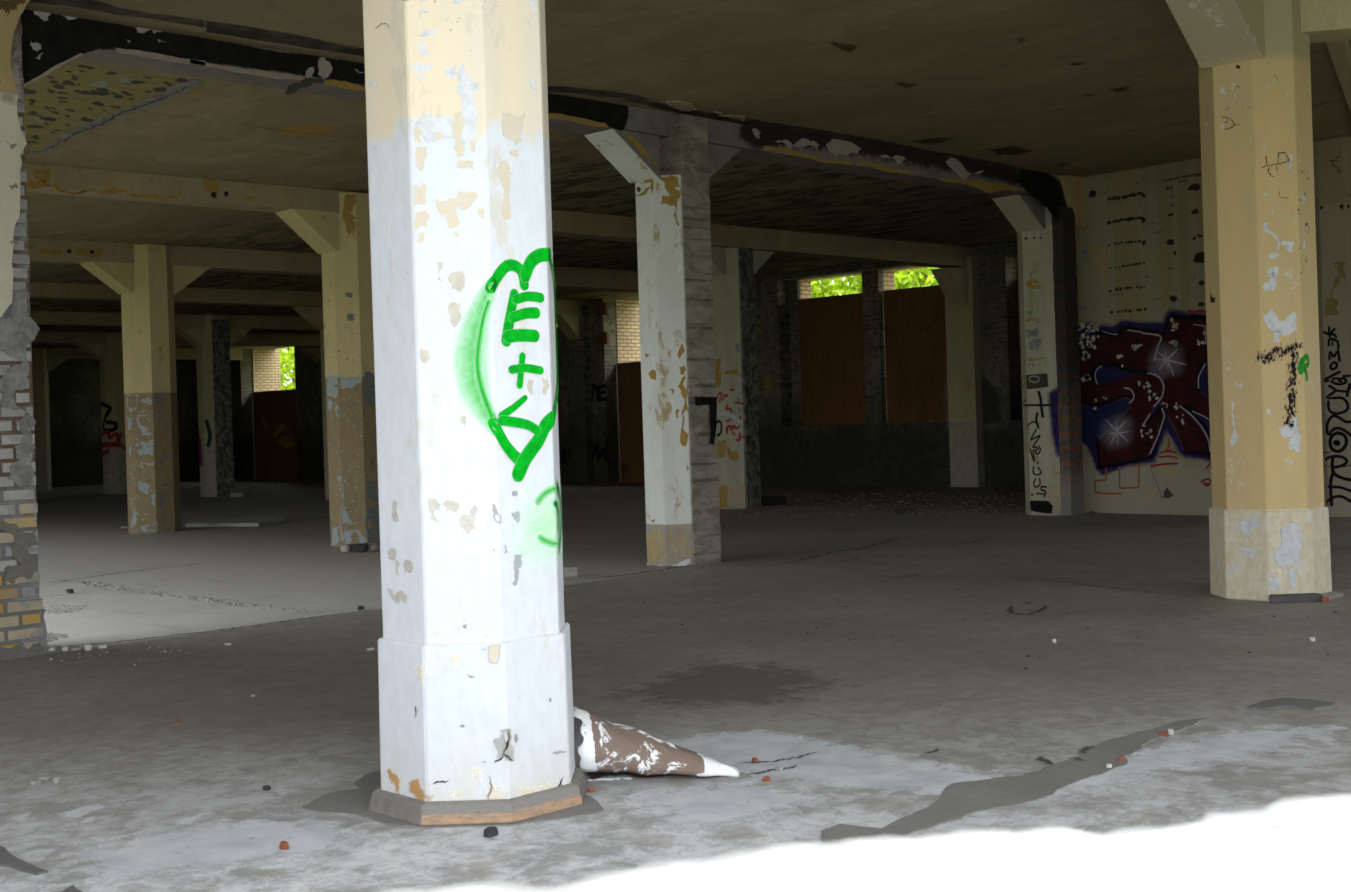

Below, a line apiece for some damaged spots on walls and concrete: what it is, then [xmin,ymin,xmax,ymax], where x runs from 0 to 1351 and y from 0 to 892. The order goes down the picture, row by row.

peeling [33,11,77,21]
peeling [6,27,379,151]
peeling [411,0,485,244]
peeling [496,112,525,220]
peeling [713,111,1018,193]
peeling [438,262,465,340]
peeling [670,344,689,446]
peeling [121,393,177,532]
peeling [1279,417,1301,467]
peeling [428,491,520,534]
peeling [493,545,522,586]
spalling [483,728,519,763]